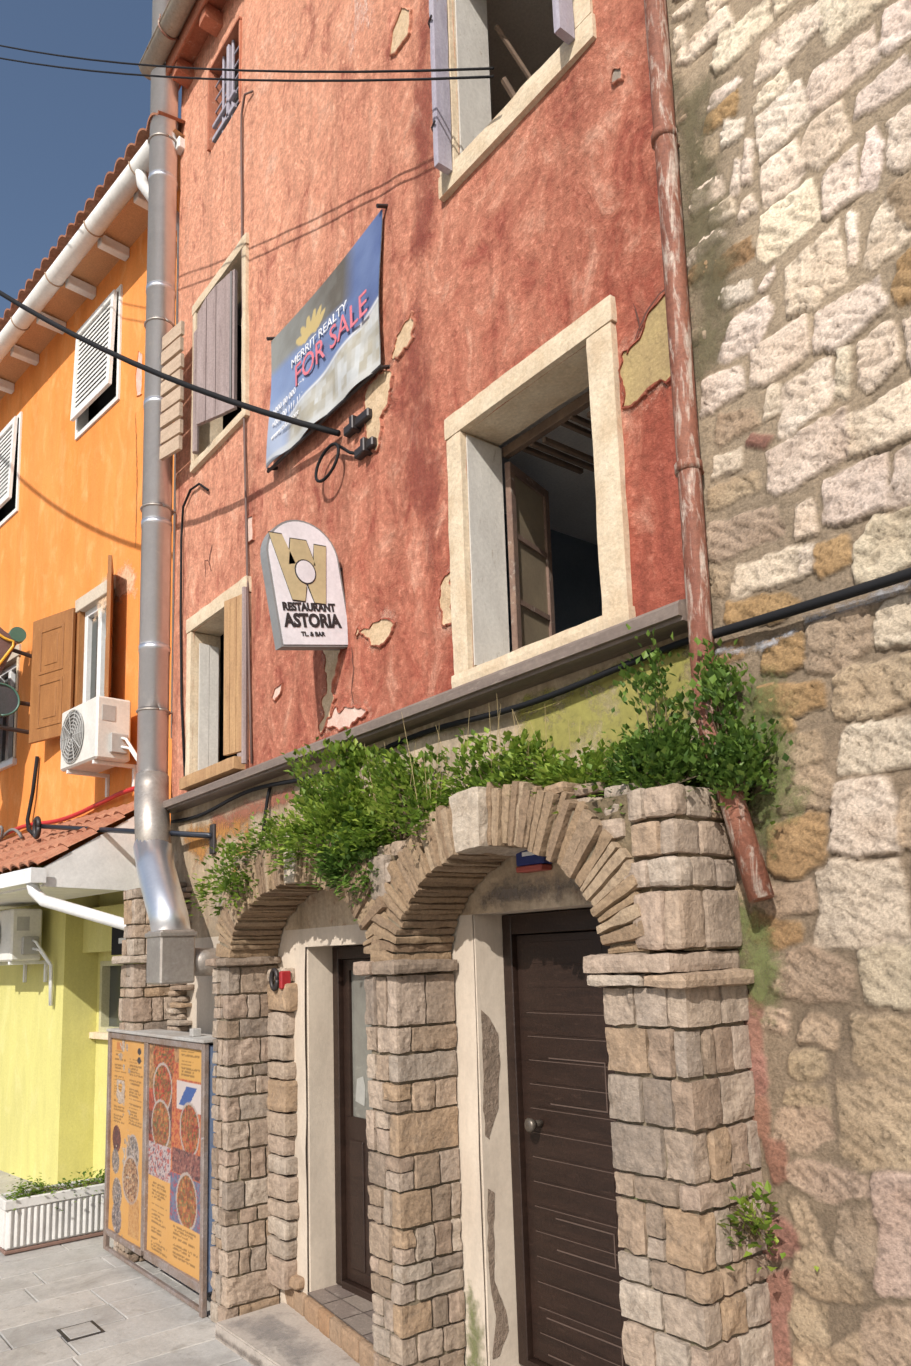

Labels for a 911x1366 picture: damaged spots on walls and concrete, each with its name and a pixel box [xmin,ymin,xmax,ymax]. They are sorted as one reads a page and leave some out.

peeling [389,7,413,57]
leakage [416,28,432,172]
peeling [363,310,418,453]
peeling [618,293,671,413]
peeling [318,649,369,735]
peeling [355,613,398,649]
spalling [481,1010,500,1138]
spalling [487,1189,509,1359]